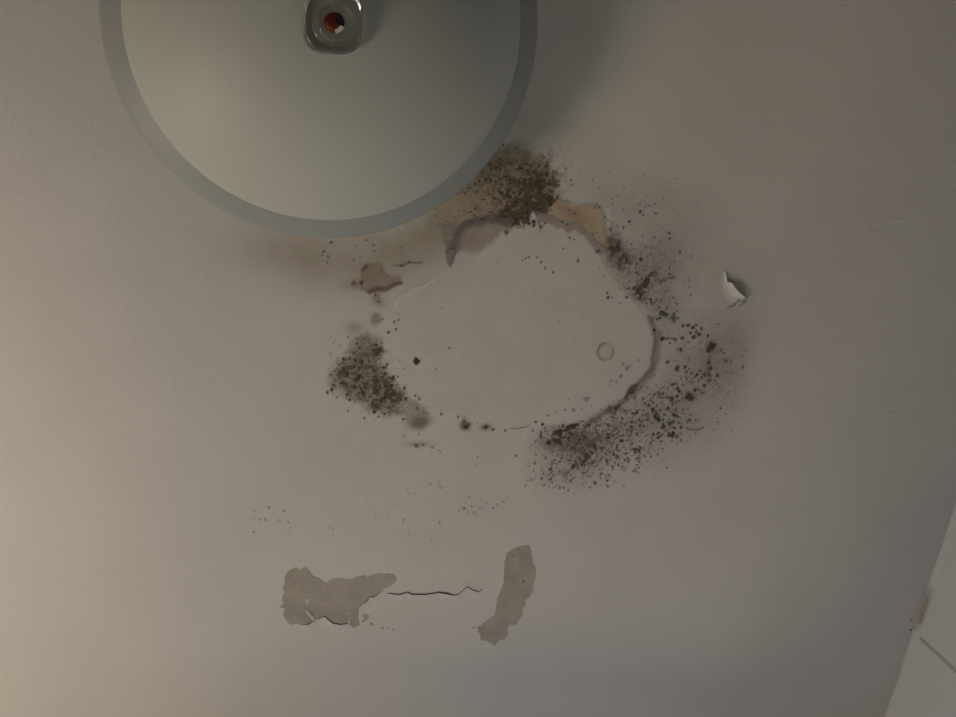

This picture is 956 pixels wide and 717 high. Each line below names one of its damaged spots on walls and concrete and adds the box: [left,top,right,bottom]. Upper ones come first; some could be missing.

damp [436,147,573,234]
peeling [717,271,747,310]
damp [326,328,424,424]
damp [531,207,727,491]
peeling [280,567,397,632]
crack [385,580,486,603]
peeling [472,545,538,652]